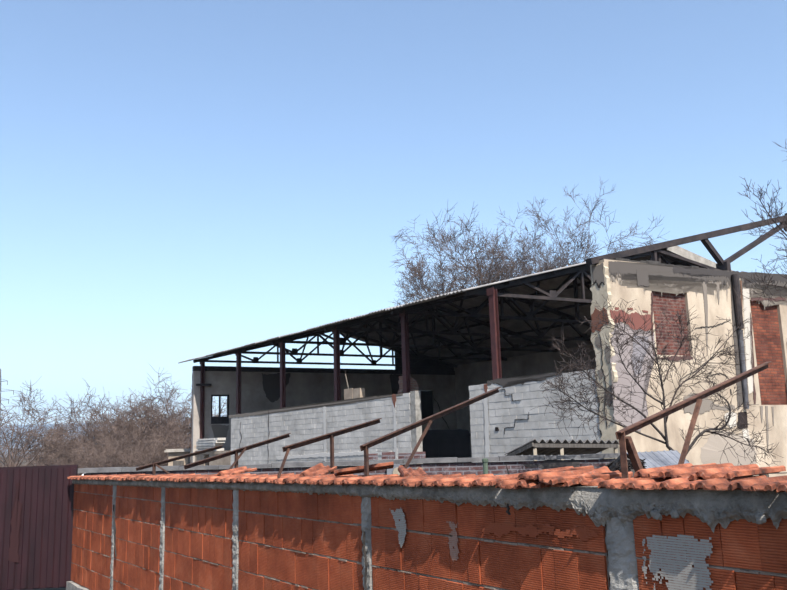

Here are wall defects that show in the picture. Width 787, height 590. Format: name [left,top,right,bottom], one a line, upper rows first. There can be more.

spalling [591,293,693,432]